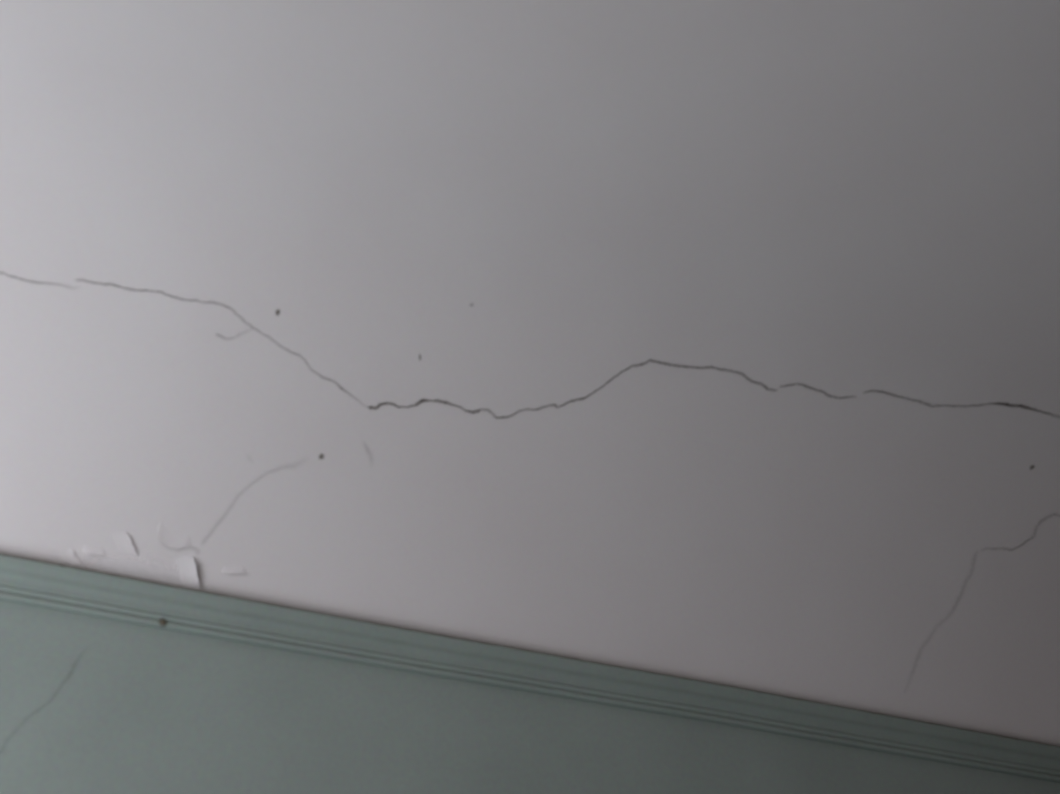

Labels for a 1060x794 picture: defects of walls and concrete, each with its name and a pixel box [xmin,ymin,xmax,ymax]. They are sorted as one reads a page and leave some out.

crack [370,399,509,418]